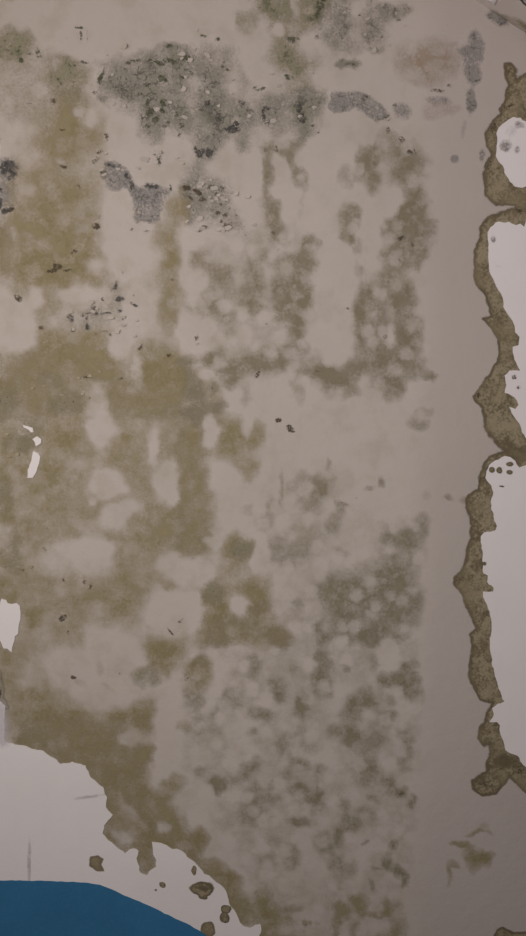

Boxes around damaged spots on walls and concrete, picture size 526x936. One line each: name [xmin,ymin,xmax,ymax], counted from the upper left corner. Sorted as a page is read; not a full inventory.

leakage [0,0,410,322]
leakage [301,128,436,396]
flaking render [460,32,483,112]
peeling [23,425,42,478]
leakage [0,236,315,634]
peeling [453,62,526,796]
peeling [0,599,21,652]
leakage [200,578,290,647]
leakage [312,519,427,698]
peeling [0,672,261,936]
leakage [0,647,287,936]
peeling [494,927,526,936]